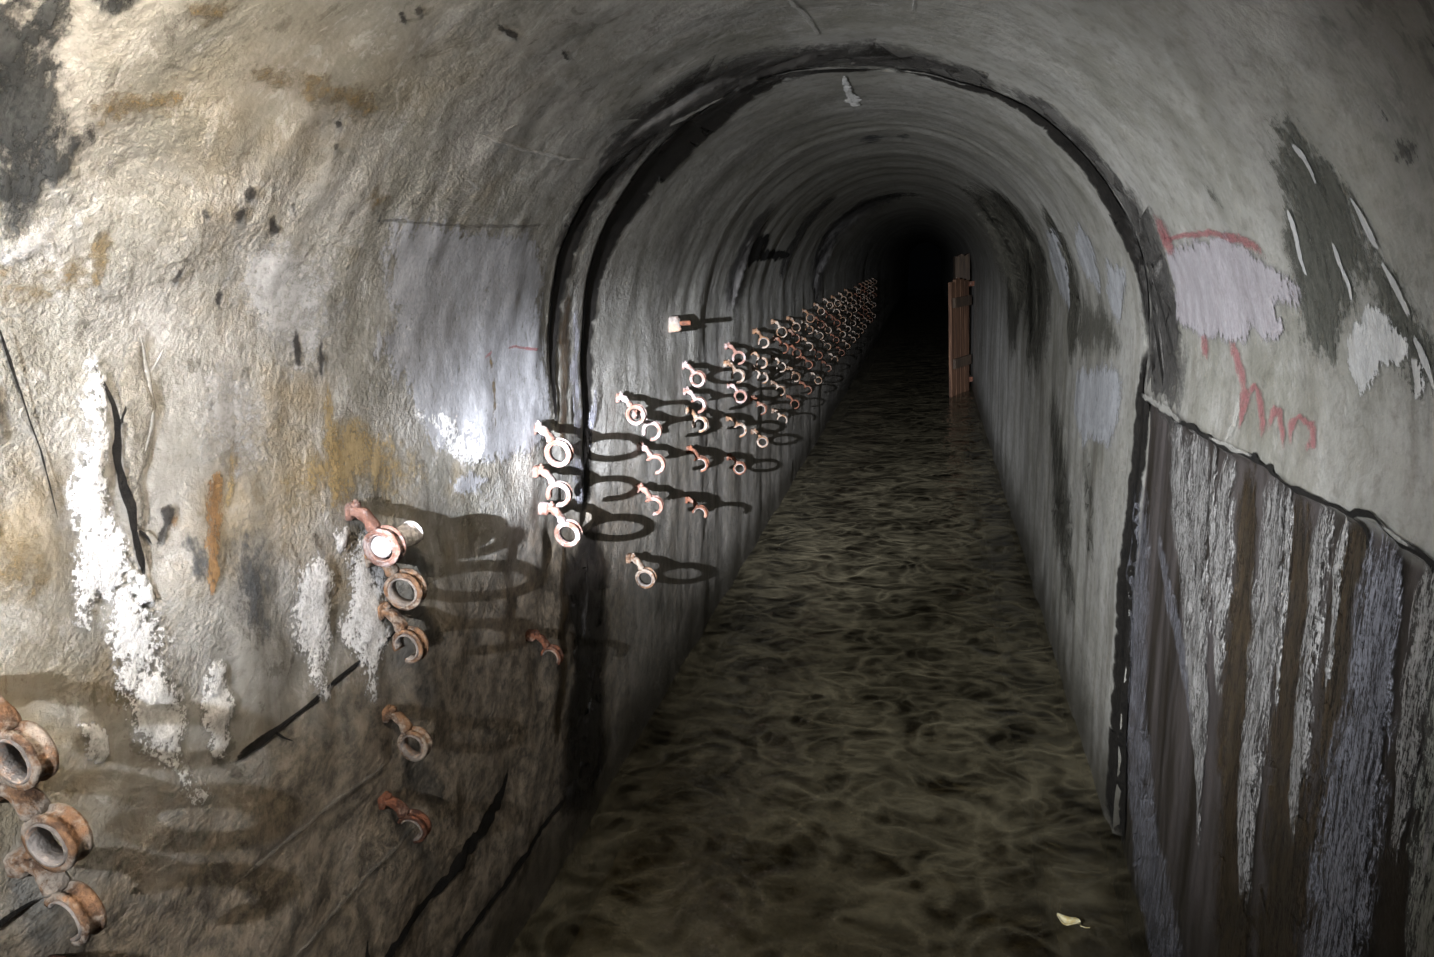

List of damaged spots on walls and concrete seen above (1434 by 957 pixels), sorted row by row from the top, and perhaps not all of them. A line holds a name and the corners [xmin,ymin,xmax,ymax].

leakage [0,0,90,237]
leakage [95,0,134,15]
peeling [1166,113,1434,399]
crack [96,339,164,575]
leakage [66,356,236,806]
corrosion [204,453,238,596]
leakage [235,531,270,636]
corrosion [287,386,421,508]
crack [482,0,1434,846]
corrosion [1213,467,1374,957]